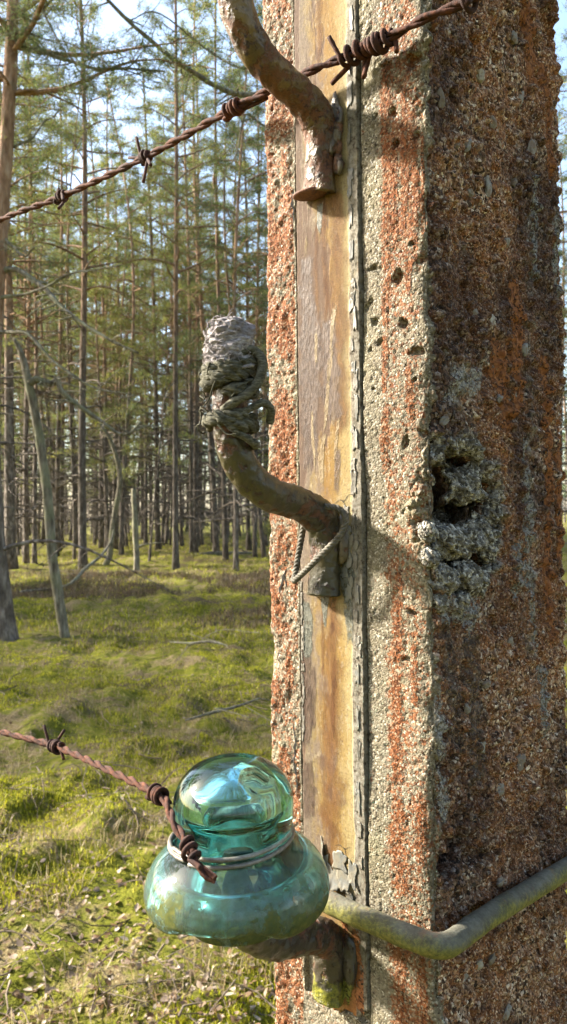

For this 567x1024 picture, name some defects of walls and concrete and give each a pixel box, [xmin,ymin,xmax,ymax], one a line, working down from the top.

corrosion [480,278,528,435]
spalling [404,424,513,615]
corrosion [538,355,566,645]
peeling [320,836,362,900]